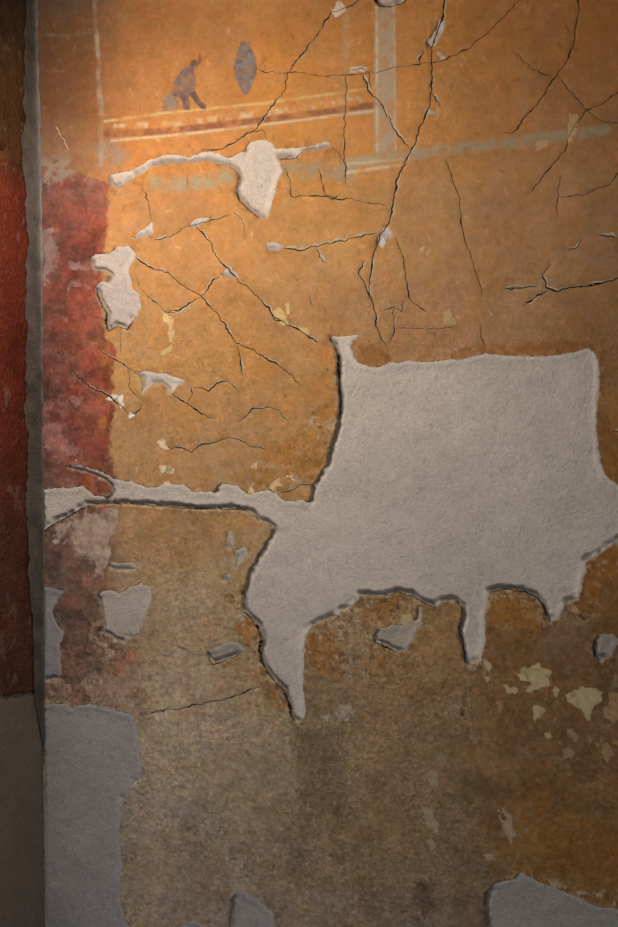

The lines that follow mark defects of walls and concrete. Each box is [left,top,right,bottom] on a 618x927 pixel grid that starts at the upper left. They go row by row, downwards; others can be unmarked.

peeling [332,0,346,17]
crack [502,0,618,214]
crack [203,0,520,361]
crack [505,264,618,306]
crack [135,183,320,452]
crack [74,337,142,414]
peeling [159,465,174,486]
peeling [271,474,295,489]
crack [151,687,257,713]
peeling [496,662,618,725]
peeling [562,728,618,762]
peeling [497,808,518,844]